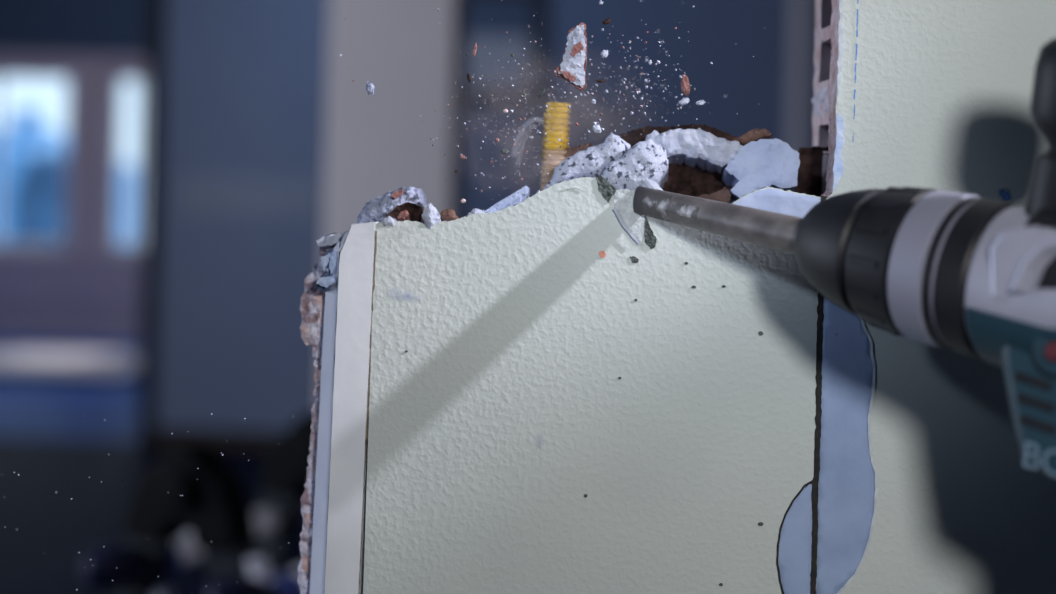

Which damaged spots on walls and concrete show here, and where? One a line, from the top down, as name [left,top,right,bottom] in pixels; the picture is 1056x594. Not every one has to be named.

spalling [596,175,657,263]
peeling [735,189,821,218]
crack [805,291,824,594]